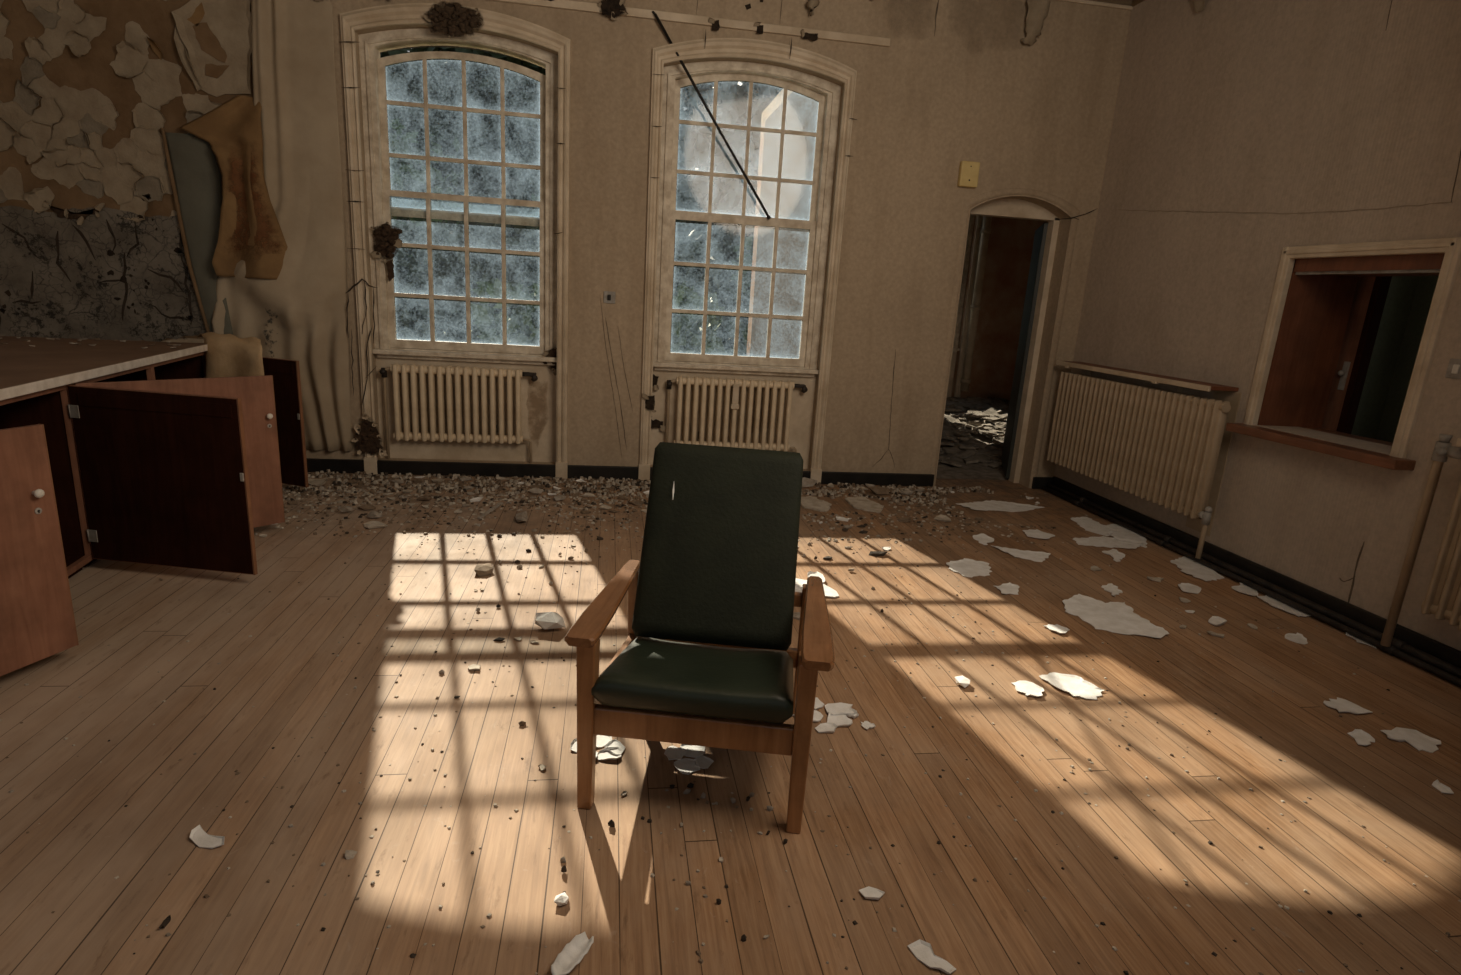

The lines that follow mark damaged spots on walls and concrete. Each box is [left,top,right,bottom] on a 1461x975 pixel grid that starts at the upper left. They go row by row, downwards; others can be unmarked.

spalling [423,1,484,38]
spalling [598,0,628,21]
spalling [745,0,763,34]
peeling [801,0,820,41]
peeling [0,0,253,225]
crack [0,193,206,342]